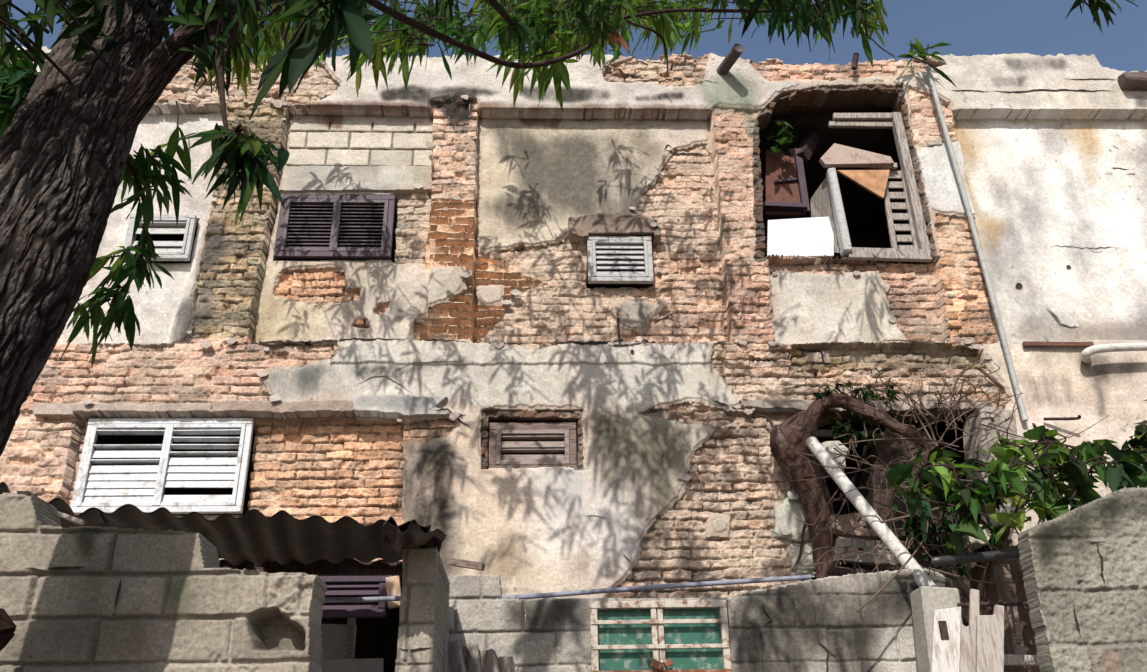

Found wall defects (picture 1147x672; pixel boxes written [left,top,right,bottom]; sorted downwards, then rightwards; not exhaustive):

water stain [496,129,640,223]
spalling [0,58,361,516]
spalling [393,59,1012,614]
water stain [402,431,454,569]
water stain [598,421,689,526]
crack [1086,541,1107,584]